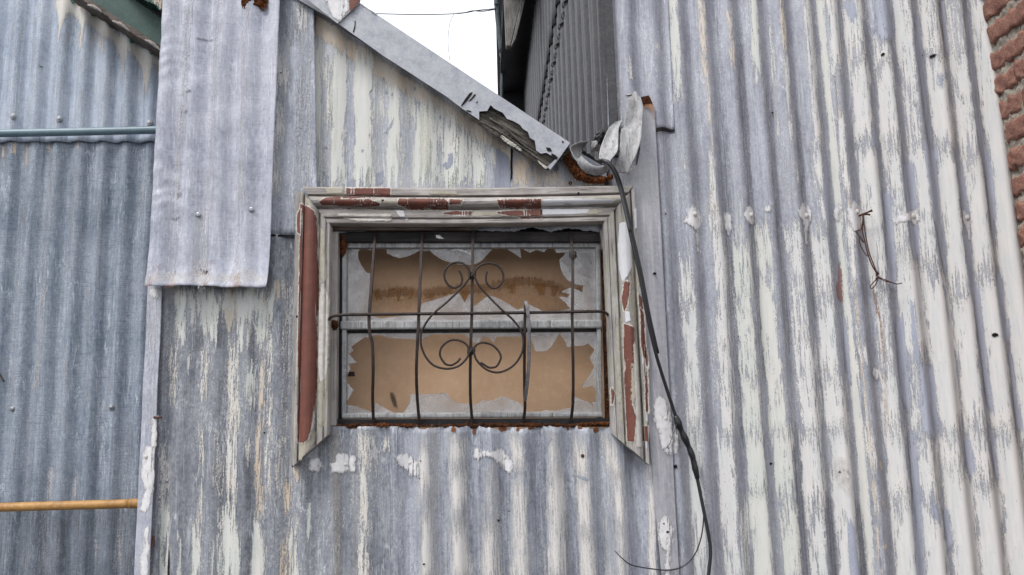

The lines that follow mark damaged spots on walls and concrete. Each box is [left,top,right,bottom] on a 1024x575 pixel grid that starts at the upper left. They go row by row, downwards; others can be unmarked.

rust [241,0,268,10]
peeling [646,0,683,103]
rust [563,151,613,184]
peeling [139,0,627,575]
rust [336,251,610,428]
peeling [546,208,650,575]
peeling [678,0,1024,575]
peeling [644,461,657,575]